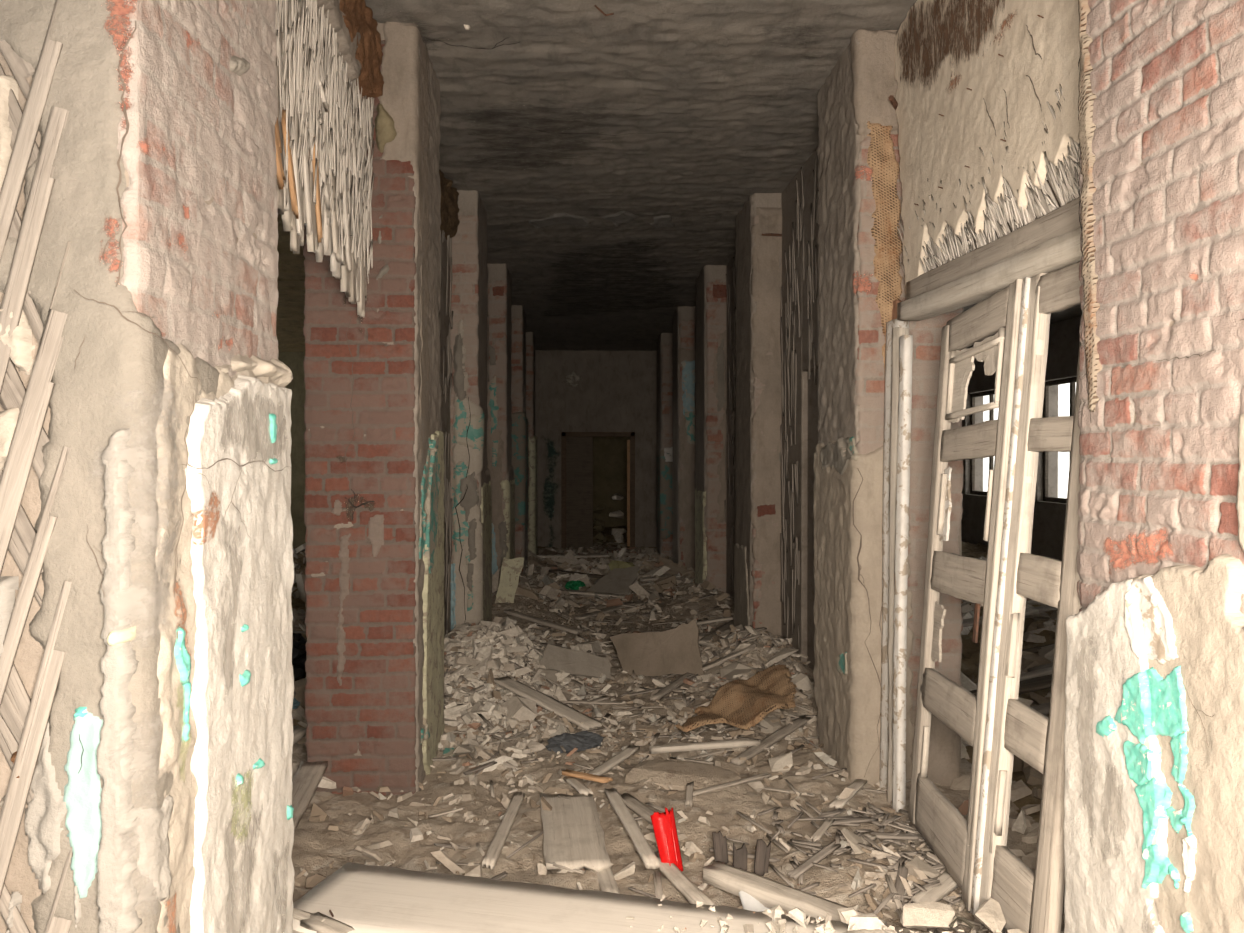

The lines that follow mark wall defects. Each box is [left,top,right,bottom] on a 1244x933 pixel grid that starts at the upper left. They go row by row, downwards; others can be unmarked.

flaking render [317,0,362,81]
water stain [439,169,460,240]
peeling [269,413,277,443]
peeling [418,333,499,631]
peeling [107,626,136,646]
peeling [174,626,192,743]
peeling [239,670,251,687]
peeling [1096,527,1197,893]
peeling [235,758,265,787]
peeling [25,707,103,928]
peeling [117,795,174,903]
peeling [1179,912,1194,933]